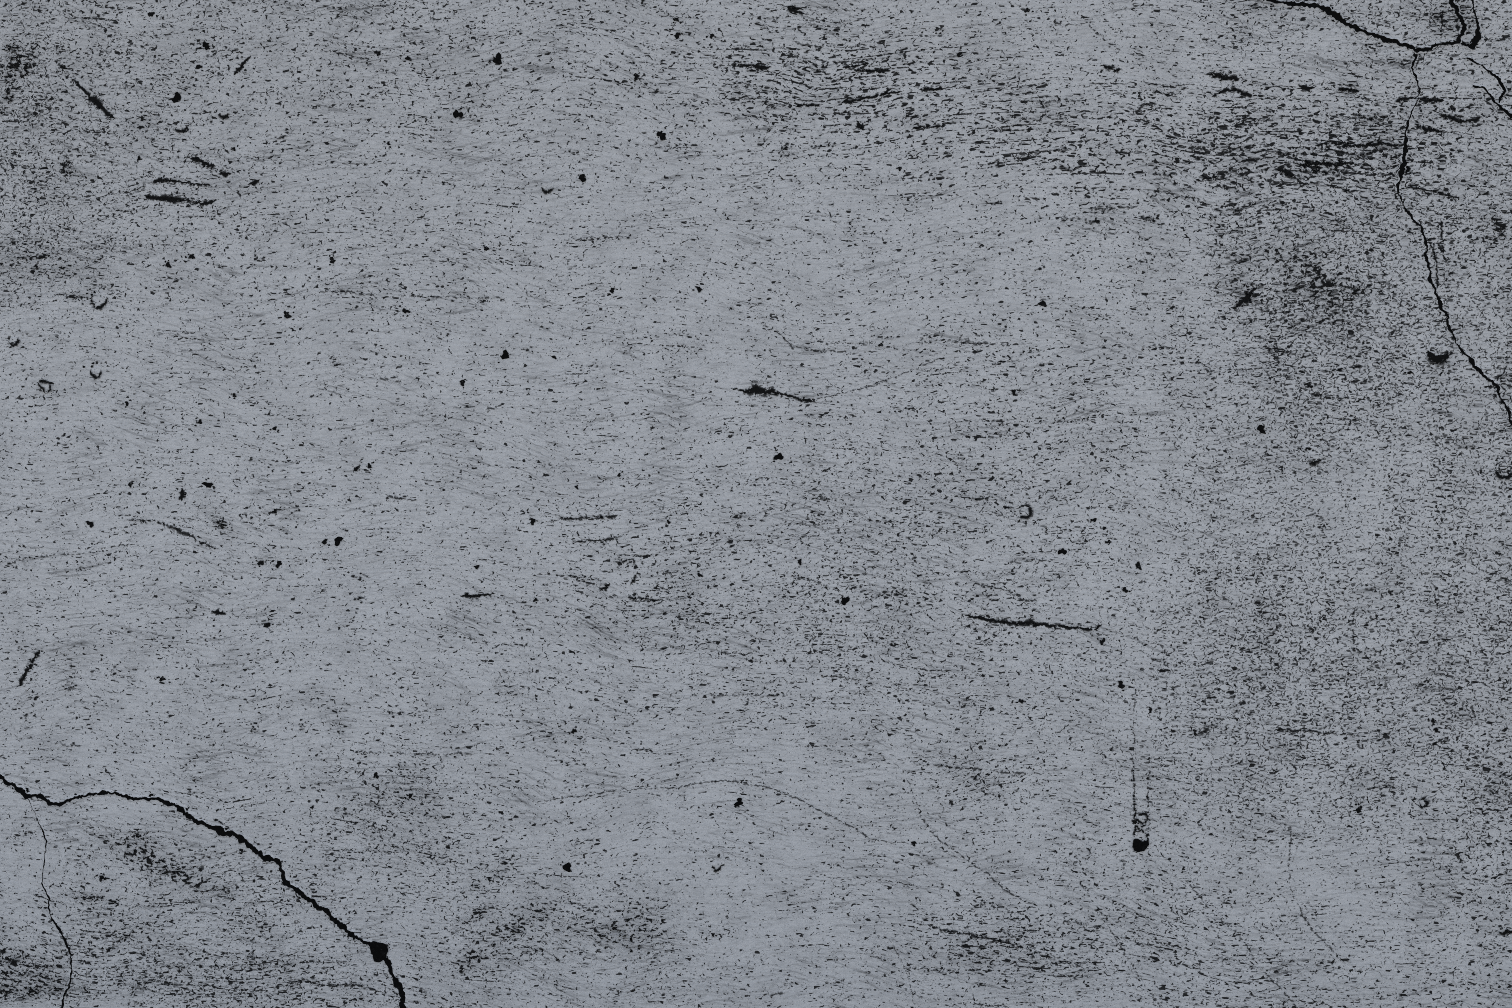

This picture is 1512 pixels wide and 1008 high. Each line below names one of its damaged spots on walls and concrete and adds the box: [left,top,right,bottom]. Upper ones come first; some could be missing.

crack [1245,0,1512,428]
crack [0,772,409,1008]